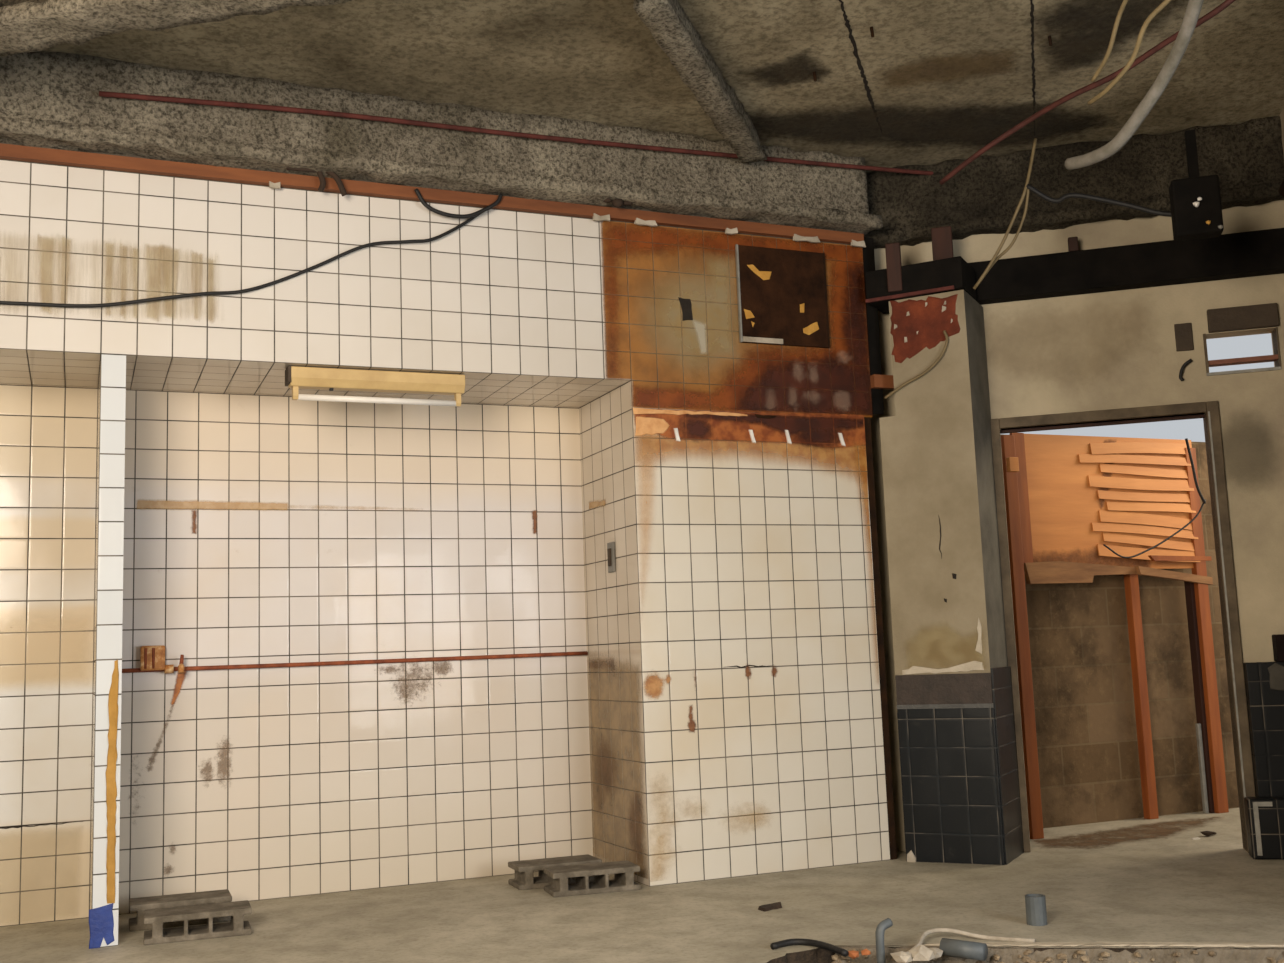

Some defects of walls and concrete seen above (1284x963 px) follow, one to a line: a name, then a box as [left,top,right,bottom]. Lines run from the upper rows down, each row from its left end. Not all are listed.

leakage [745,54,828,86]
leakage [886,55,1008,86]
leakage [749,103,1105,147]
corrosion [602,221,873,571]
leakage [382,661,449,698]
corrosion [645,675,671,698]
corrosion [688,706,696,732]
leakage [590,660,644,877]